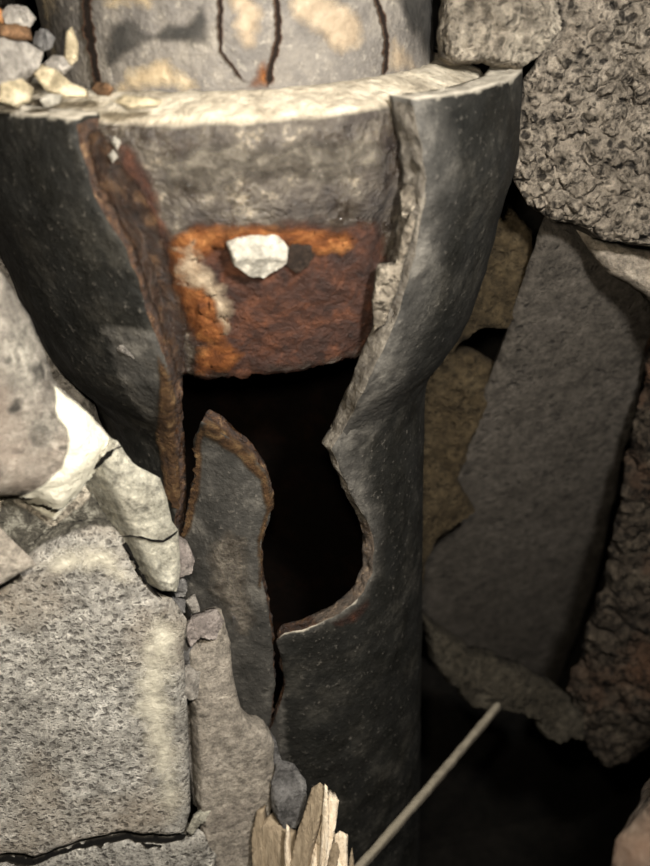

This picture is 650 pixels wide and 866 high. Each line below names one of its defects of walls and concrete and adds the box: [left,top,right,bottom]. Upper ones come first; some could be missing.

crack [81,0,101,84]
crack [217,0,283,86]
crack [375,0,390,75]
corrosion [89,130,384,564]
crack [0,831,189,866]